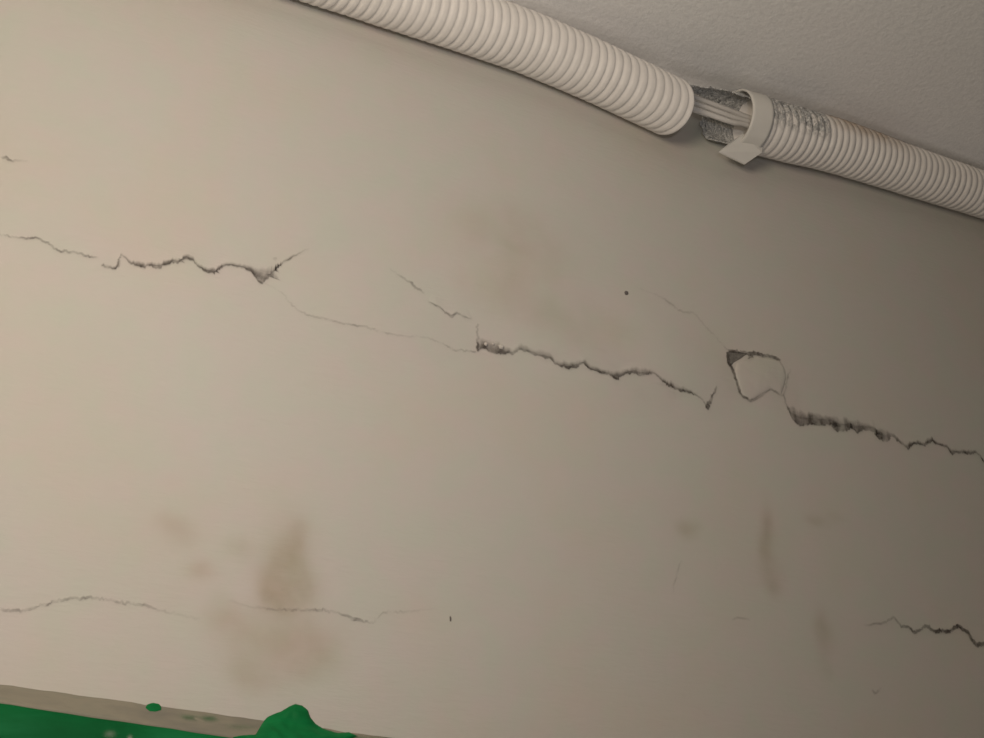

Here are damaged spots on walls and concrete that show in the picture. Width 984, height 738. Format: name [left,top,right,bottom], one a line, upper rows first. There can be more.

crack [113,244,291,283]
crack [476,340,713,409]
flaking render [726,350,786,401]
crack [787,404,984,462]
crack [910,615,984,647]